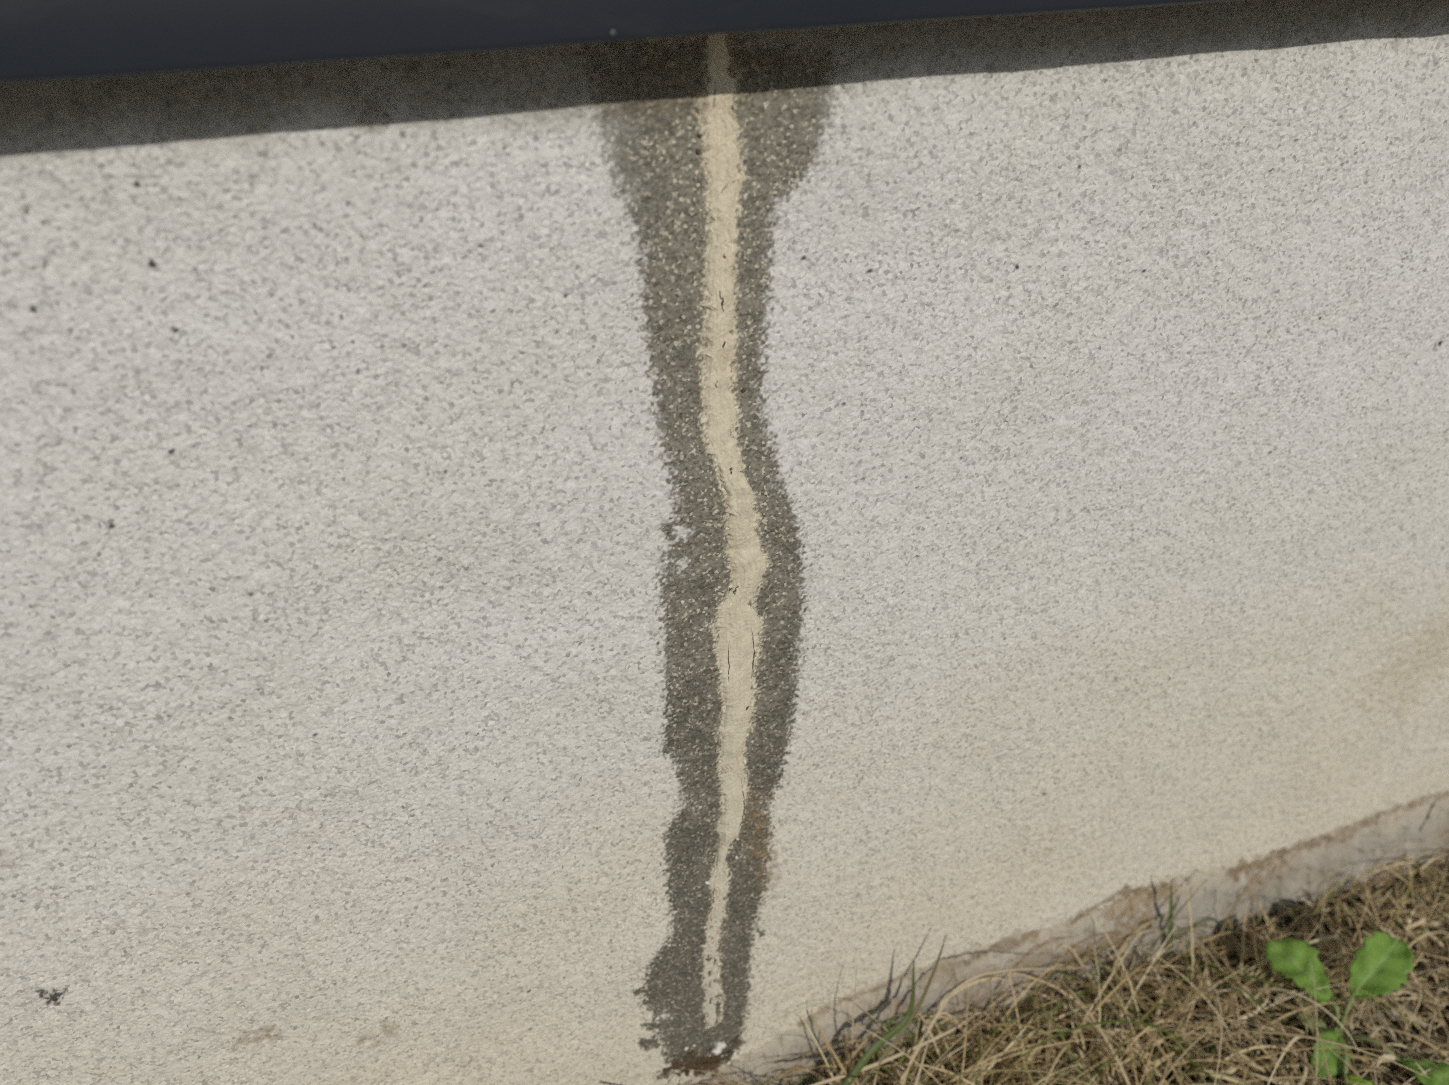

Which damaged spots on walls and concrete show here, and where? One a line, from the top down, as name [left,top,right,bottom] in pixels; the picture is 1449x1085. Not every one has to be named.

water stain [583,37,835,1064]
crack [684,34,773,1065]